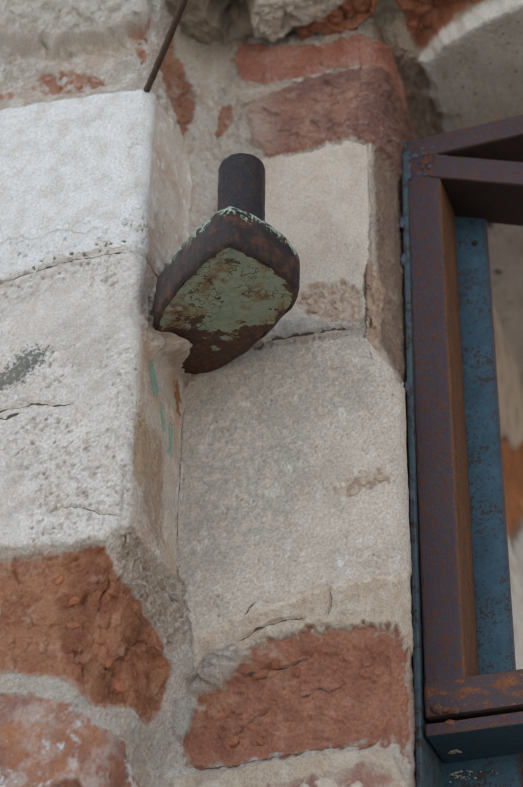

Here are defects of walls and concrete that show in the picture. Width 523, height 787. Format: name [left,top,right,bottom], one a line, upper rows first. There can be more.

spalling [297,0,379,41]
peeling [397,0,523,133]
crack [256,327,349,349]
peeling [487,223,523,384]
crack [0,403,70,420]
spalling [53,527,191,712]
spalling [207,646,394,763]